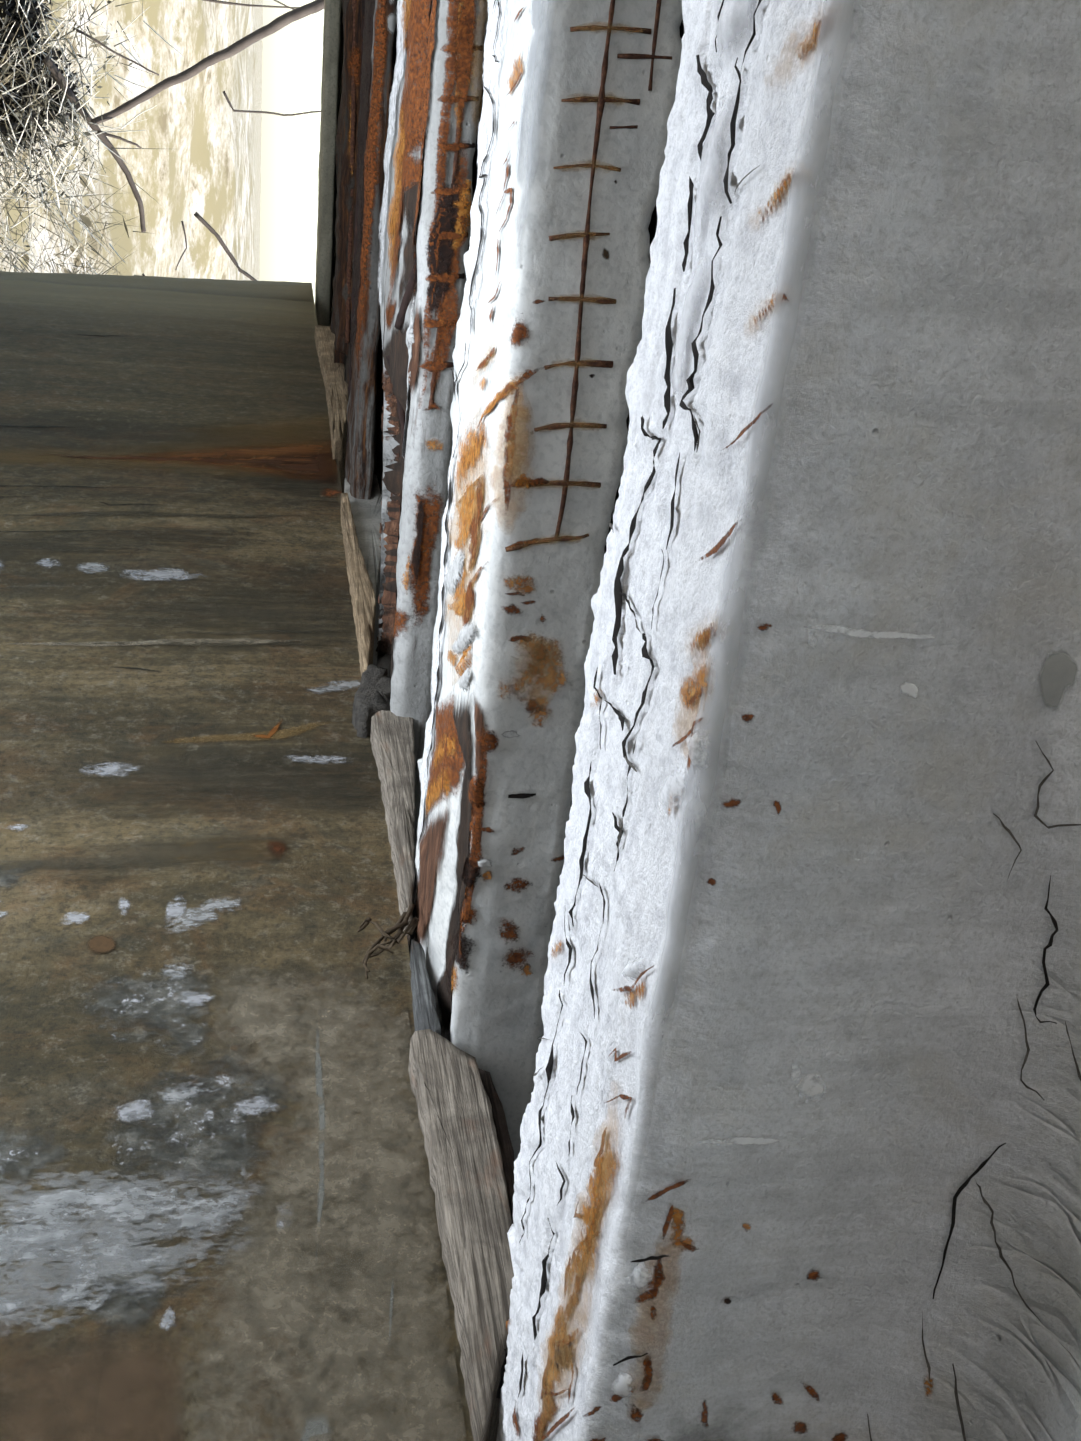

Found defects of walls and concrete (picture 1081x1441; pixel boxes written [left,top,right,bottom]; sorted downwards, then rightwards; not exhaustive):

corrosion [347,0,460,410]
corrosion [402,322,549,690]
corrosion [500,576,566,726]
crack [496,0,762,1435]
corrosion [658,622,714,813]
corrosion [700,522,738,560]
crack [993,741,1081,878]
crack [1017,876,1081,1100]
water stain [0,1027,284,1333]
corrosion [533,1130,653,1441]
corrosion [631,1180,695,1320]
crack [922,1143,1041,1441]